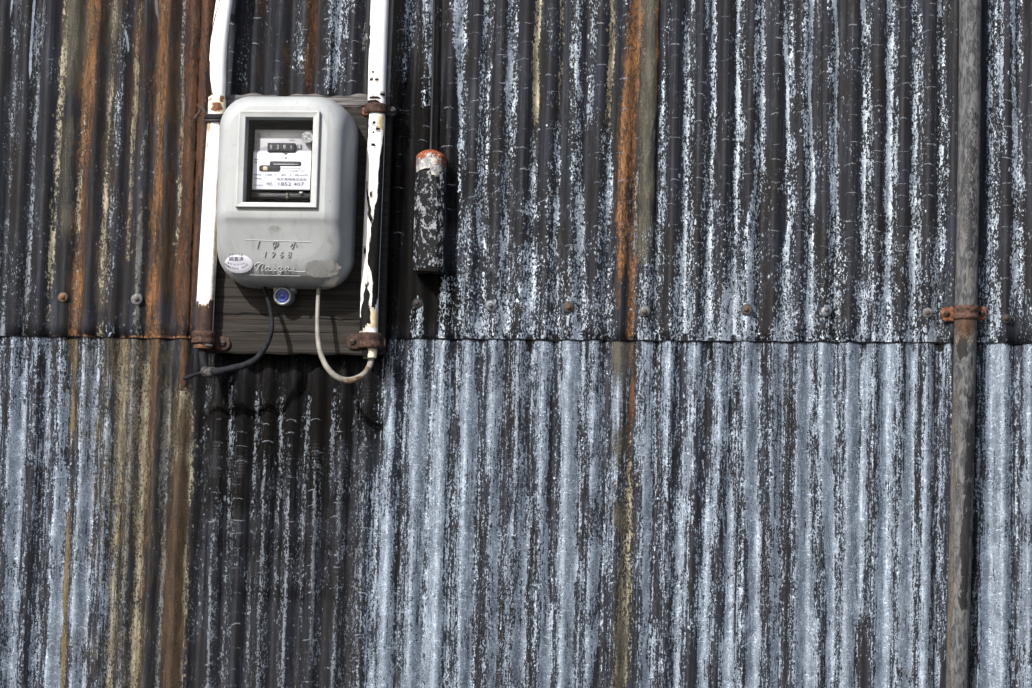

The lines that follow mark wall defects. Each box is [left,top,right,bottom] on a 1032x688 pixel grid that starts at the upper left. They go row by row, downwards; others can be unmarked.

rust [67,0,105,436]
rust [120,0,224,688]
rust [416,149,447,168]
rust [615,0,644,455]
peeling [243,0,1032,688]
rust [60,515,70,688]